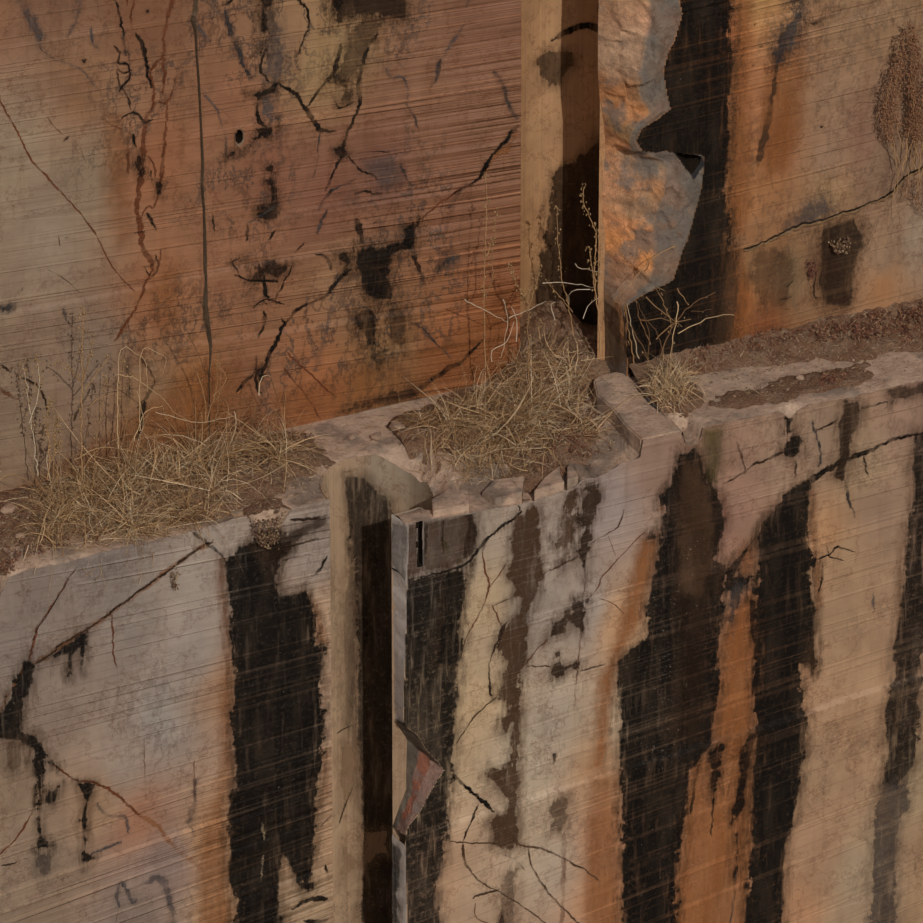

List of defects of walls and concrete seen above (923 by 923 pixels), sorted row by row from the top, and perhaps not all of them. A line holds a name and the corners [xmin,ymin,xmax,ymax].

crack [190,0,212,442]
crack [236,268,352,416]
spalling [598,0,704,338]
water stain [624,0,742,377]
crack [744,166,923,252]
crack [29,541,226,667]
water stain [224,516,328,923]
water stain [345,476,477,923]
crack [451,784,599,923]
water stain [485,482,604,850]
water stain [616,416,818,923]
water stain [868,433,923,923]